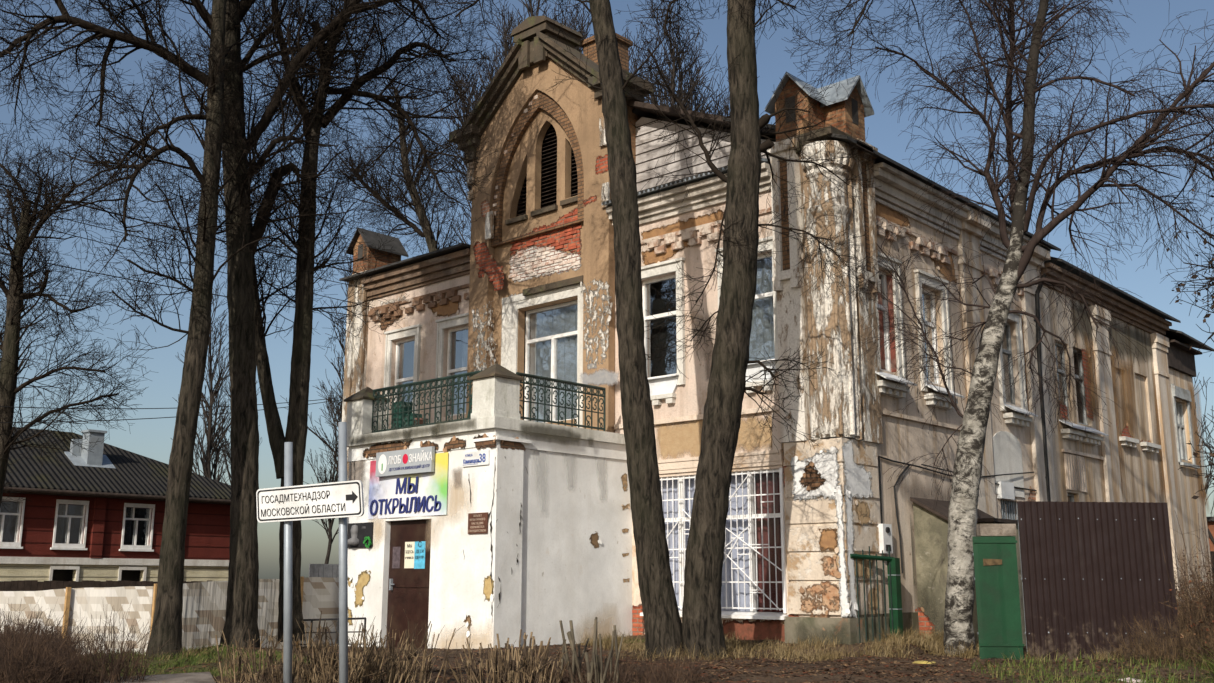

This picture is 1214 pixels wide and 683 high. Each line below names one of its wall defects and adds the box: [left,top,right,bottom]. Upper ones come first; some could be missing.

spalling [595,154,608,175]
flaking render [428,194,613,371]
damp [1072,307,1095,412]
damp [1108,322,1153,487]
damp [1154,377,1166,491]
damp [1190,388,1208,506]
peeling [589,531,603,548]
peeling [723,416,878,642]
peeling [348,570,371,625]